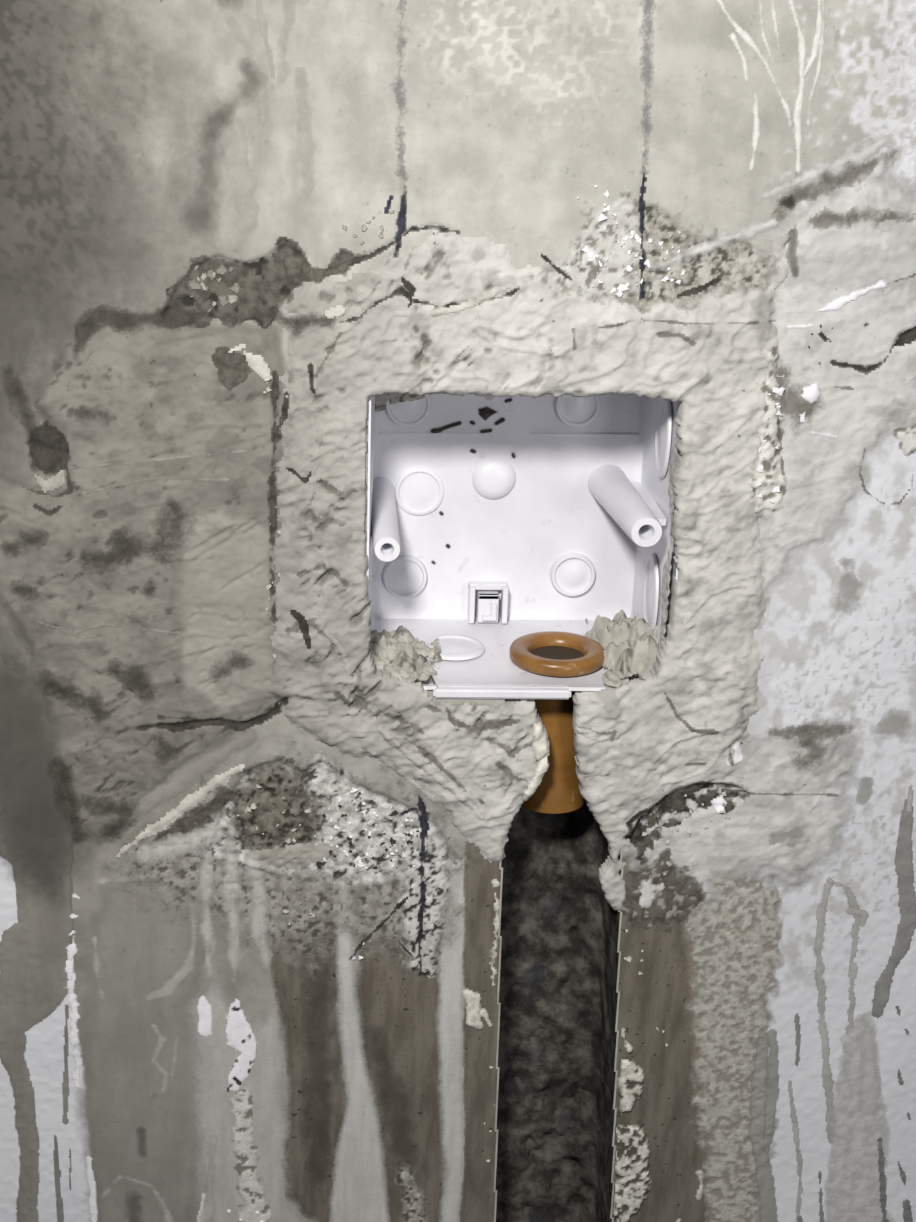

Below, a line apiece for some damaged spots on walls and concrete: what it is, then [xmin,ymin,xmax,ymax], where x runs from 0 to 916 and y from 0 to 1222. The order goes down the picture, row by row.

spalling [75,237,334,349]
spalling [539,185,779,312]
peeling [31,456,65,493]
crack [263,193,519,649]
water stain [0,653,76,1222]
water stain [83,879,345,1222]
spalling [113,751,462,978]
water stain [356,932,444,1222]
spalling [623,781,791,933]
water stain [763,1029,803,1222]
water stain [860,785,916,1114]
water stain [877,1138,913,1222]